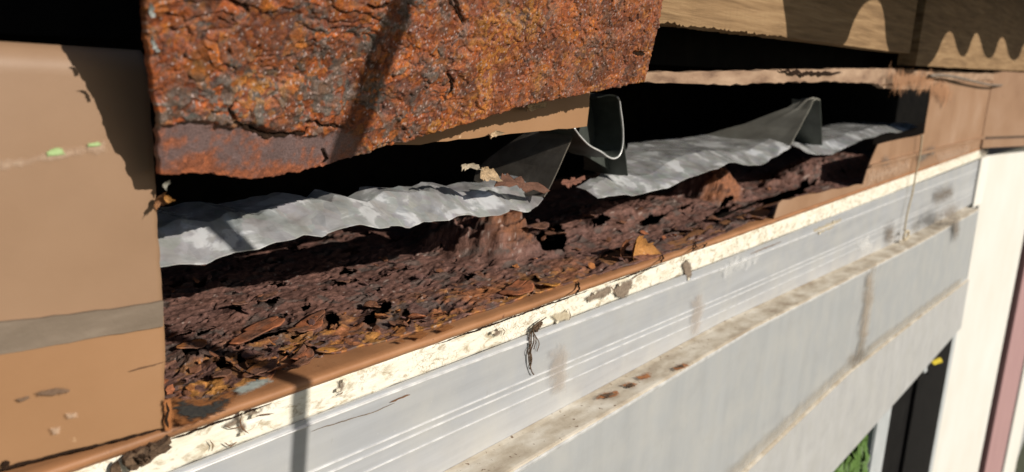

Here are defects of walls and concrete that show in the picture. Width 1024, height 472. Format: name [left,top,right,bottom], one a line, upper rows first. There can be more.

corrosion [461,163,550,193]
corrosion [561,175,586,188]
corrosion [524,222,568,236]
spalling [540,240,571,259]
corrosion [620,235,661,261]
peeling [683,257,692,281]
peeling [587,271,645,302]
corrosion [363,300,390,318]
peeling [552,308,571,324]
corrosion [176,338,207,349]
corrosion [211,309,345,378]
corrosion [596,372,651,399]